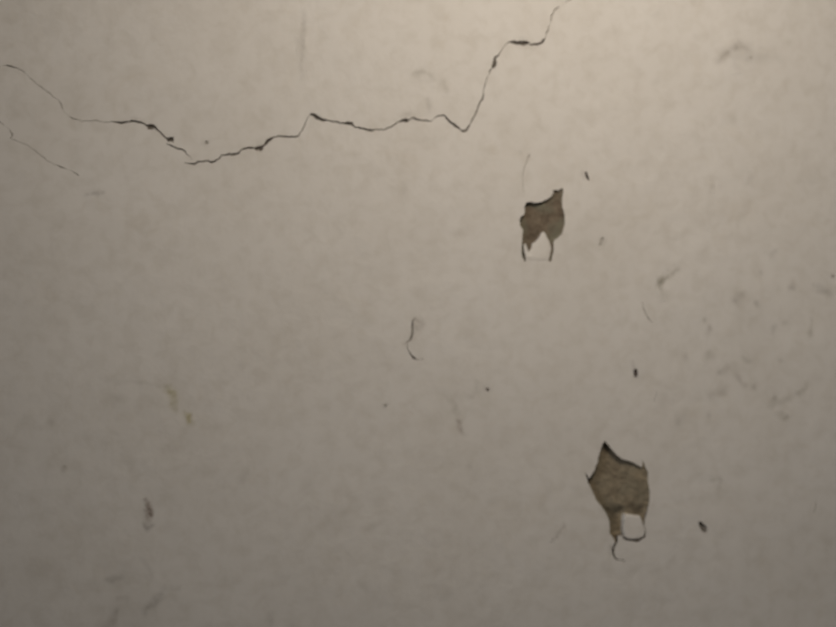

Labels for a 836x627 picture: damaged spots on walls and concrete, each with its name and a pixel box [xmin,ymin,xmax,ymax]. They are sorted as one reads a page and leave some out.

crack [5,0,570,165]
spalling [519,188,565,262]
crack [406,318,421,360]
spalling [585,441,650,562]